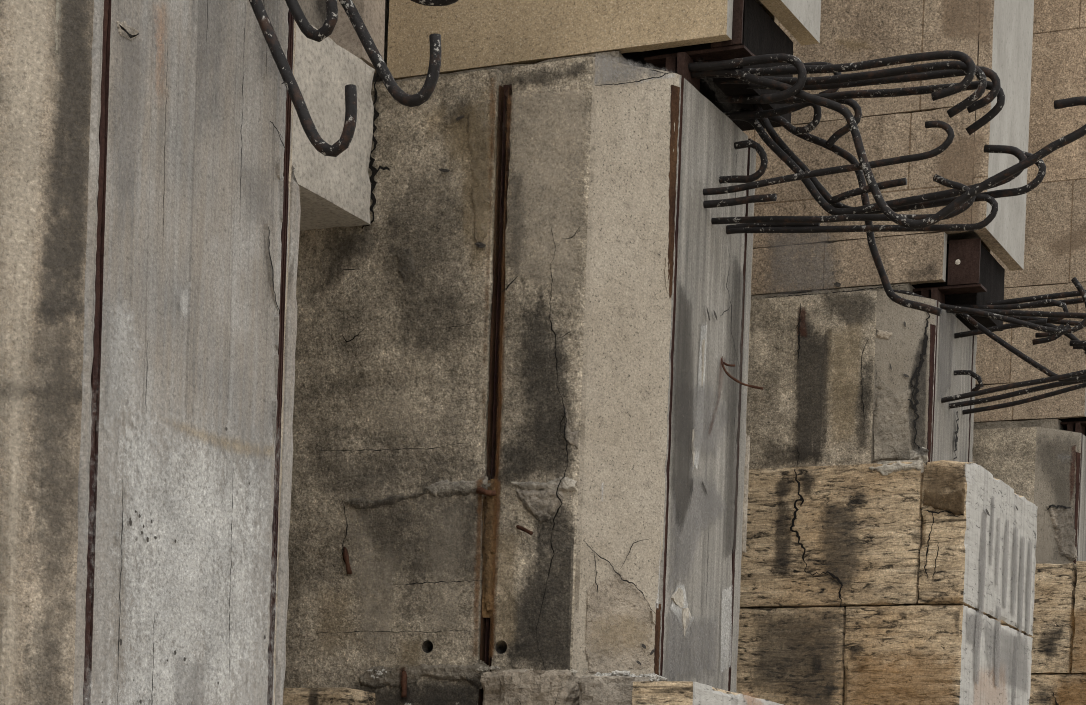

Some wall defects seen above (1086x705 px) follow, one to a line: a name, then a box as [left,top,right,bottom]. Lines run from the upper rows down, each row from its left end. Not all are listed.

crack [362,71,390,229]
leakage [0,0,94,705]
rust [474,479,500,655]
leakage [501,297,568,483]
leakage [509,507,574,671]
crack [536,227,580,670]
crack [583,539,655,613]
crack [790,446,843,607]
leakage [822,493,865,590]
crack [908,313,930,448]
crack [920,508,963,578]
crack [952,411,960,459]